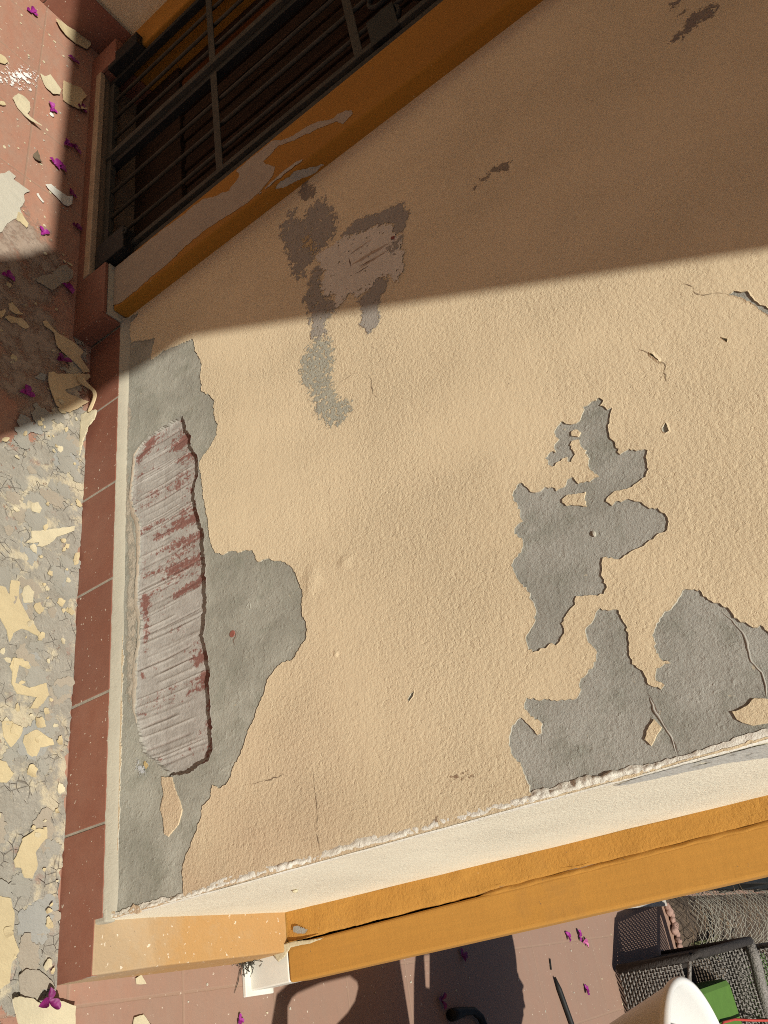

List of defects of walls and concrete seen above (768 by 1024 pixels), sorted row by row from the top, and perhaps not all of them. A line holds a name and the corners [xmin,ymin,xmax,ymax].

peeling [113,110,410,342]
peeling [114,312,307,918]
peeling [508,397,768,803]
crack [296,886,502,941]